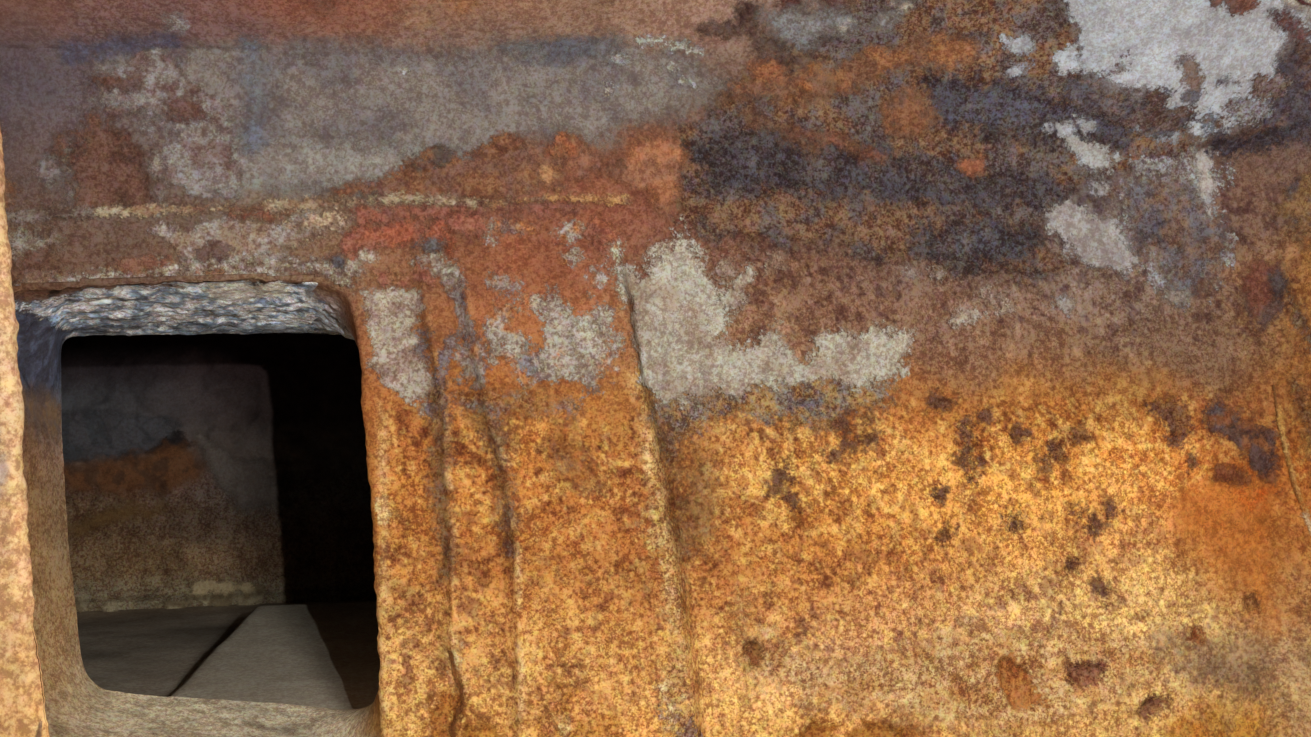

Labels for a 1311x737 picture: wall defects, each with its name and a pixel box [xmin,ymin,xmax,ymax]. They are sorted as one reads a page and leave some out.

damp [6,0,1311,291]
crack [449,651,490,737]